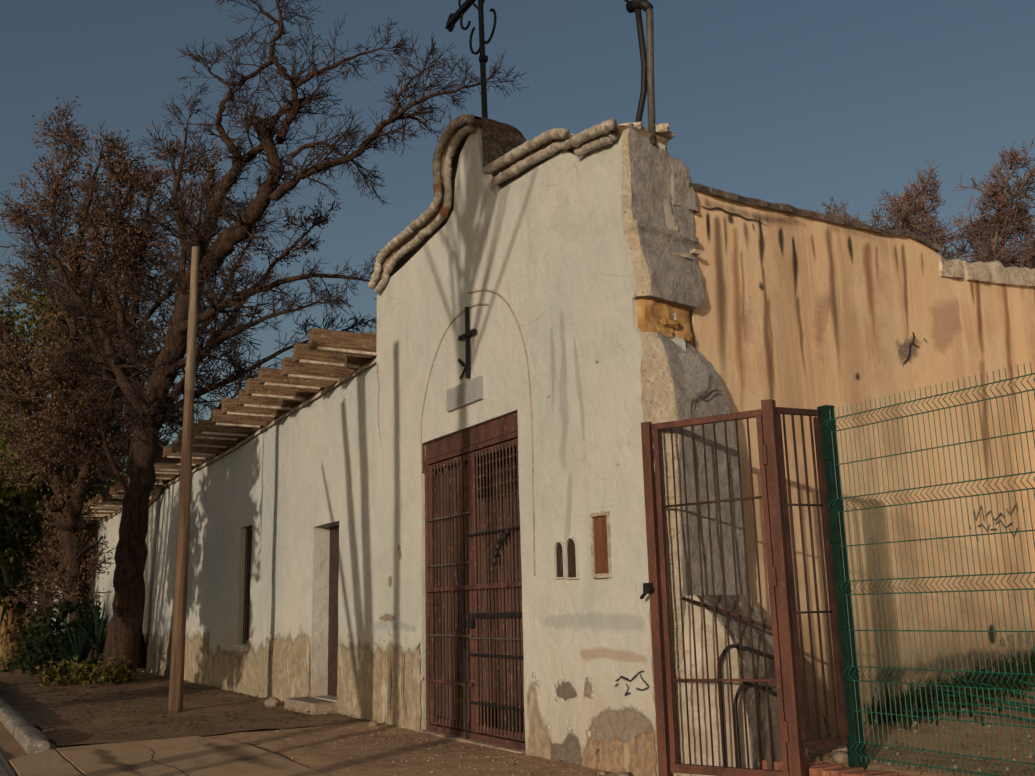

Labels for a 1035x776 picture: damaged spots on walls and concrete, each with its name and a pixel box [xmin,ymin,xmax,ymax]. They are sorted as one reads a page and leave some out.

damp [706,202,727,334]
crack [702,206,765,229]
damp [763,275,773,399]
damp [745,215,802,348]
damp [827,231,836,327]
crack [903,333,927,365]
spalling [337,614,423,731]
spalling [527,672,657,776]